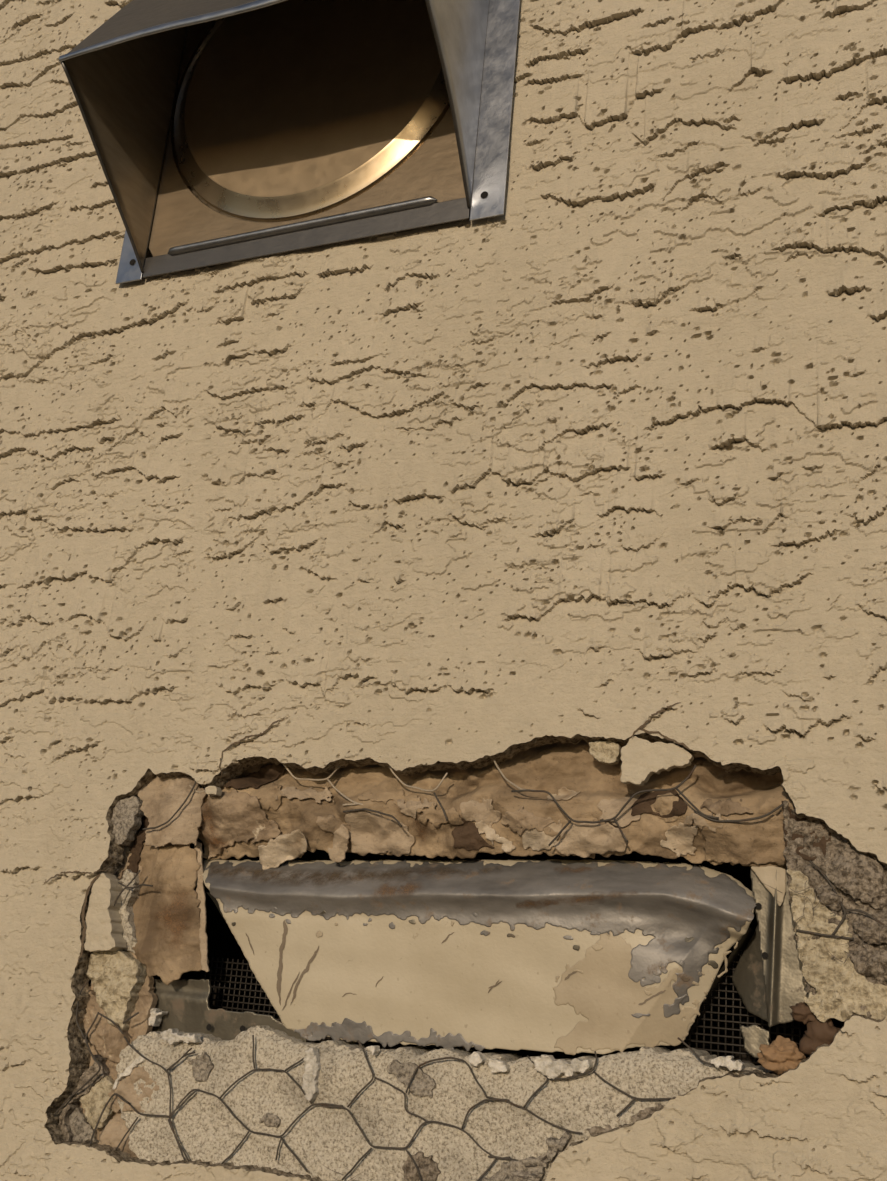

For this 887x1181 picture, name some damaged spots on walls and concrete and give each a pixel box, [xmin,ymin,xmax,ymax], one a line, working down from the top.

flaking render [44,732,887,1181]